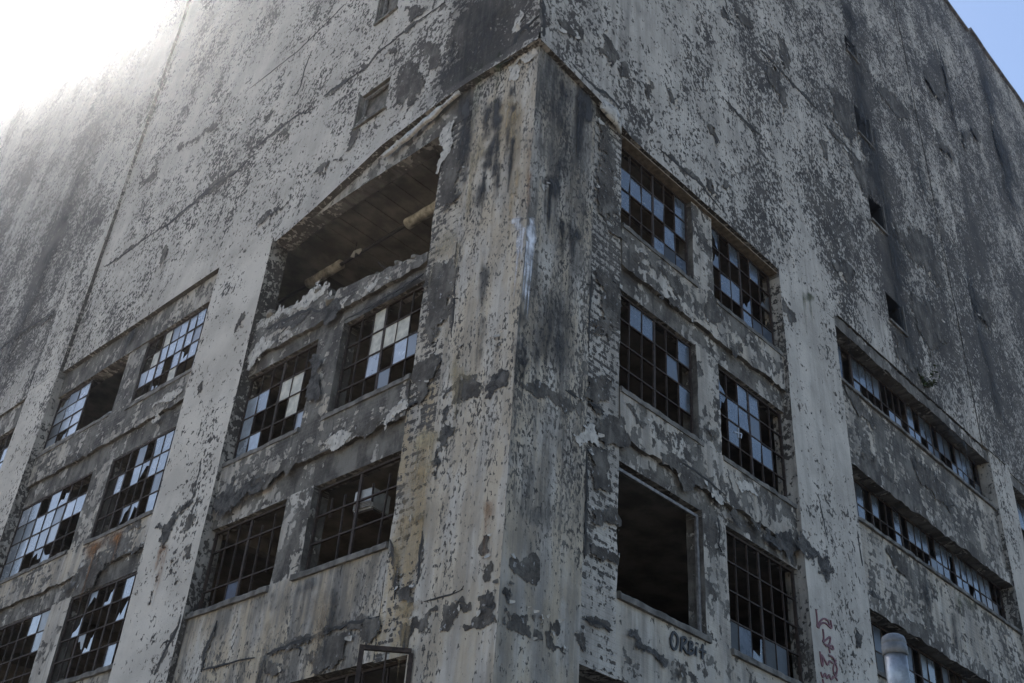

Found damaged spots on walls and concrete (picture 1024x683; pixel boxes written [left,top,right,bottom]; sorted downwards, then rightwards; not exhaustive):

peeling [384,0,520,111]
damp [458,88,521,212]
damp [552,70,594,158]
peeling [828,83,893,204]
peeling [421,257,460,347]
damp [480,268,488,297]
damp [511,218,535,300]
damp [544,160,580,257]
peeling [430,345,509,480]
peeling [521,375,651,532]
spalling [147,497,200,605]
peeling [394,533,566,654]